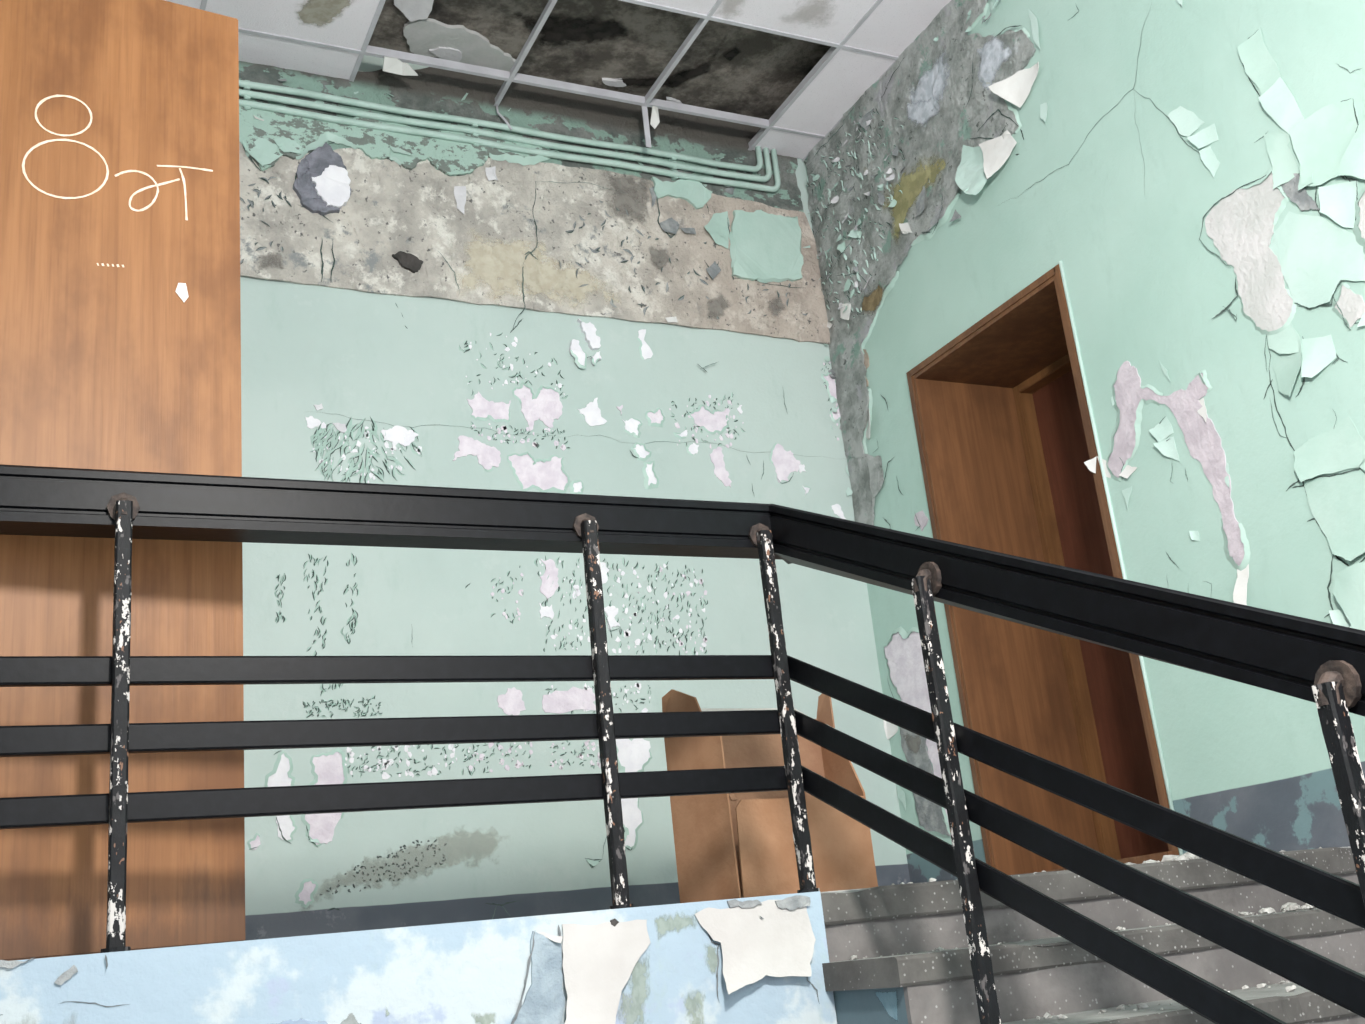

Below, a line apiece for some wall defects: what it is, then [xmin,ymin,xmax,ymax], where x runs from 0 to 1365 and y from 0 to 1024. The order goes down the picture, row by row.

damp [298,0,350,26]
peeling [1199,28,1365,398]
spalling [239,0,1048,531]
crack [1263,323,1365,627]
peeling [1299,463,1365,631]
peeling [542,683,596,714]
peeling [884,626,932,713]
peeling [265,742,533,787]
peeling [616,738,652,773]
peeling [621,798,644,851]
peeling [511,920,650,1024]
peeling [694,895,820,1004]